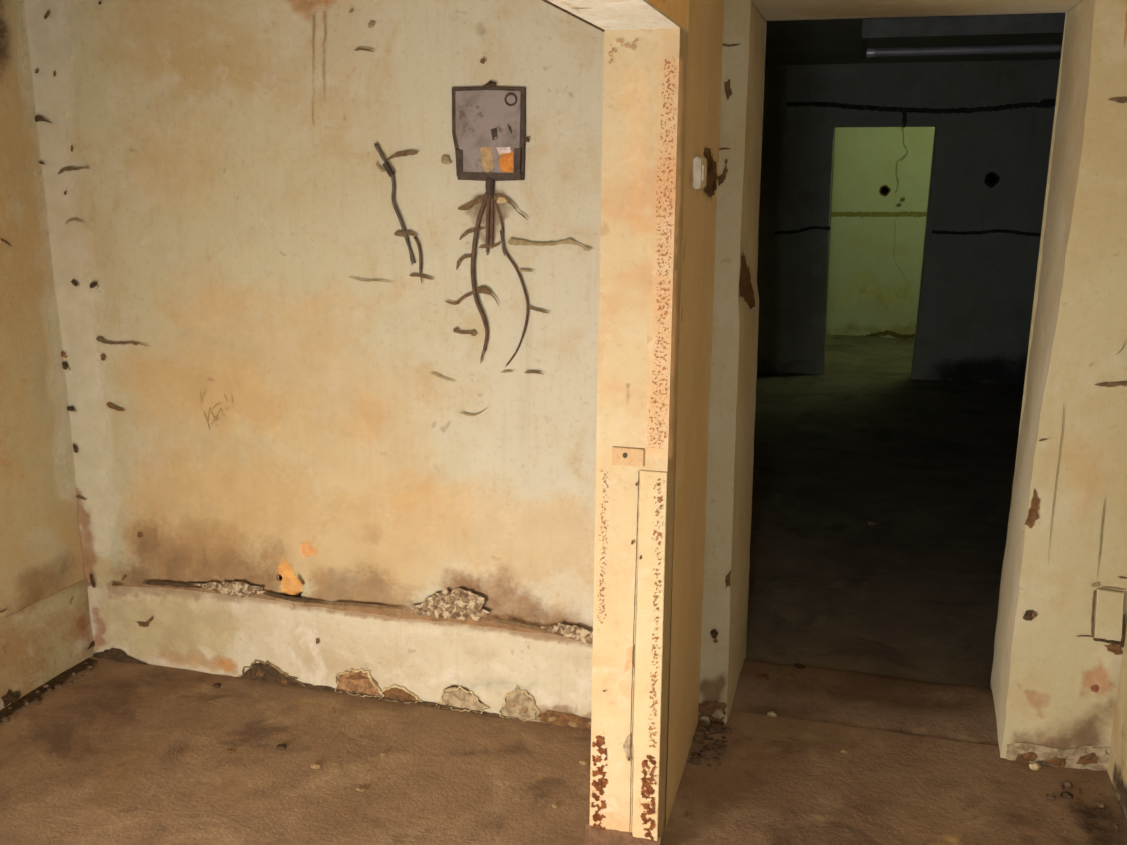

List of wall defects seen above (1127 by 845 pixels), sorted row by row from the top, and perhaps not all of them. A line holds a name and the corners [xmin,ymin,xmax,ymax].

crack [374,143,418,172]
crack [350,194,591,374]
rust [649,57,676,448]
water stain [120,527,277,601]
flaking render [410,588,490,622]
water stain [424,576,584,641]
flaking render [335,668,422,703]
flaking render [436,685,591,730]
rust [591,736,607,831]
flaking render [1006,743,1110,771]
water stain [1019,716,1099,750]
water stain [1073,767,1127,845]